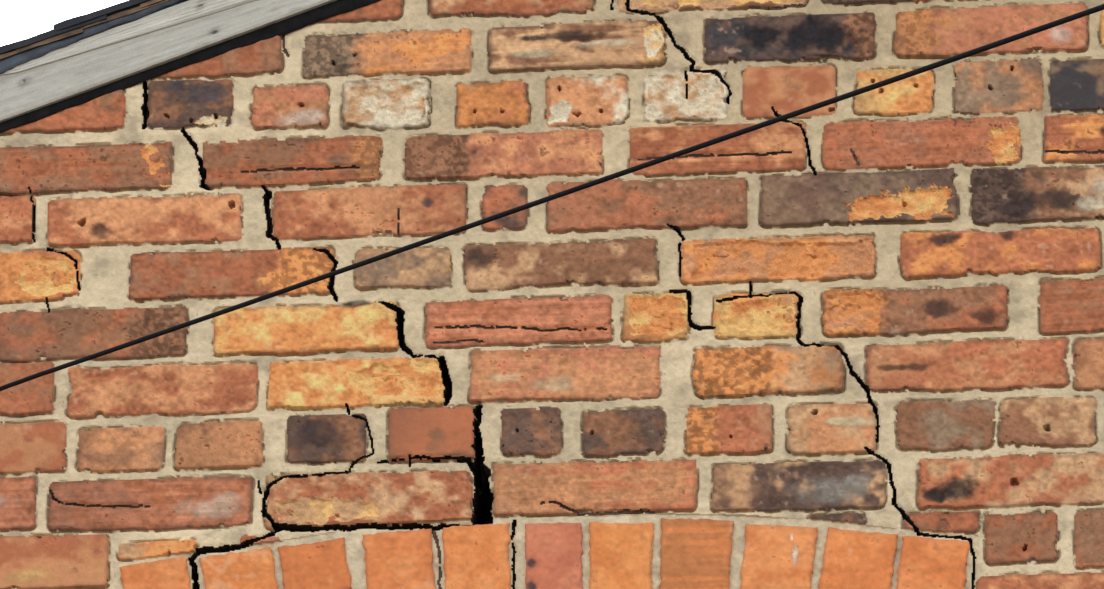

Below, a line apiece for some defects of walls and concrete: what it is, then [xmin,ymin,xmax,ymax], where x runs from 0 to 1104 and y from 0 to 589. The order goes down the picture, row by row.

crack [749,2,806,10]
crack [610,0,732,104]
crack [141,81,150,129]
crack [180,127,211,191]
crack [638,106,817,176]
crack [850,148,860,166]
crack [241,165,360,250]
crack [394,208,402,236]
crack [313,248,338,302]
crack [667,223,976,589]
crack [188,301,607,589]
crack [540,501,655,516]